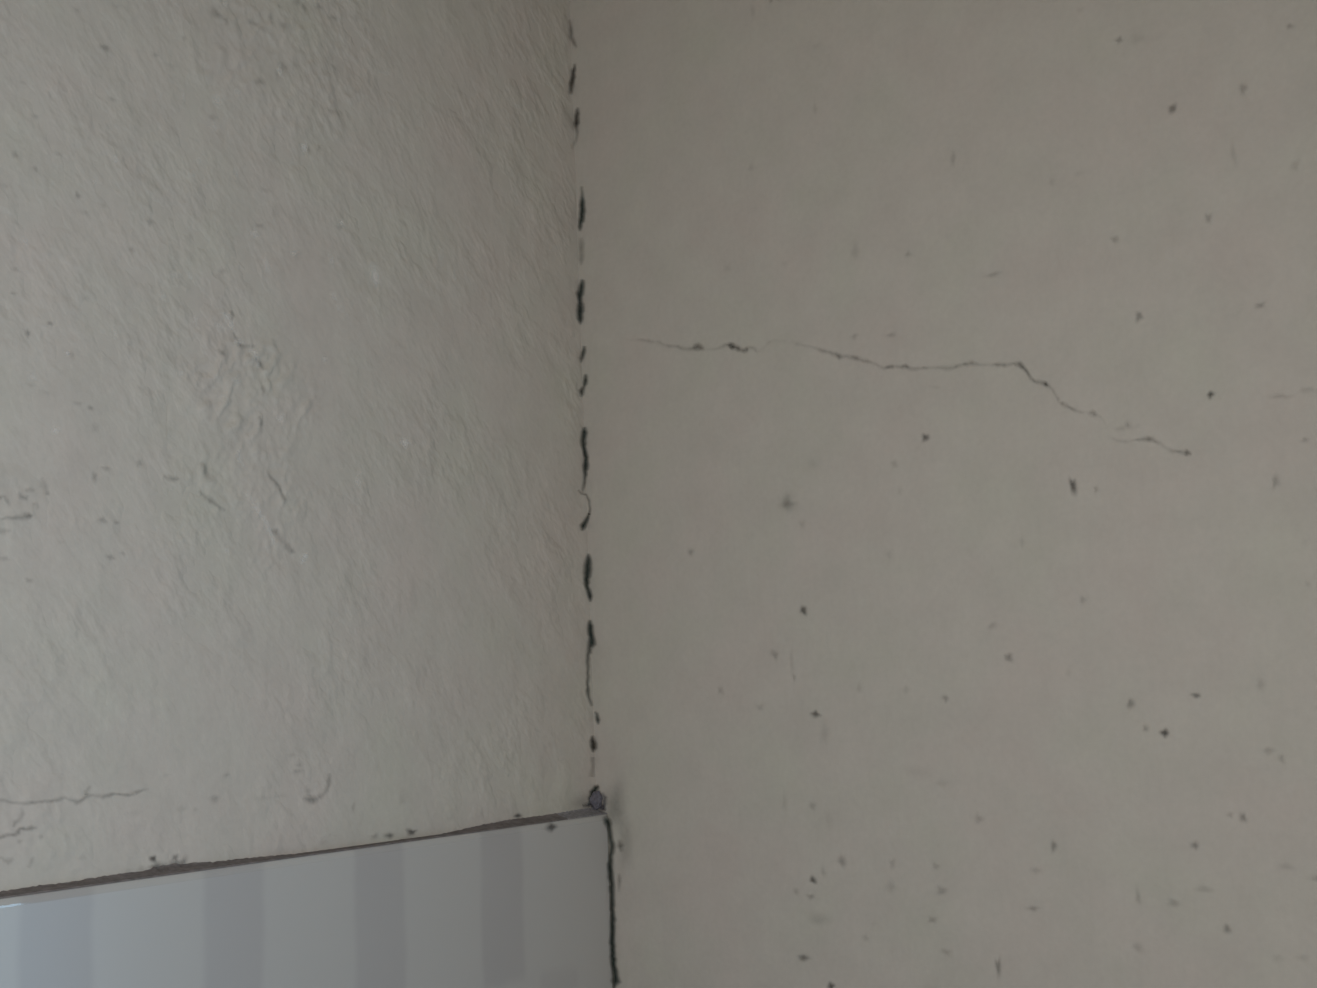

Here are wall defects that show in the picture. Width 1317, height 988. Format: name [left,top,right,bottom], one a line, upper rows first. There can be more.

crack [570,69,578,126]
crack [577,198,585,228]
crack [578,282,587,394]
crack [581,428,589,477]
crack [581,514,594,652]